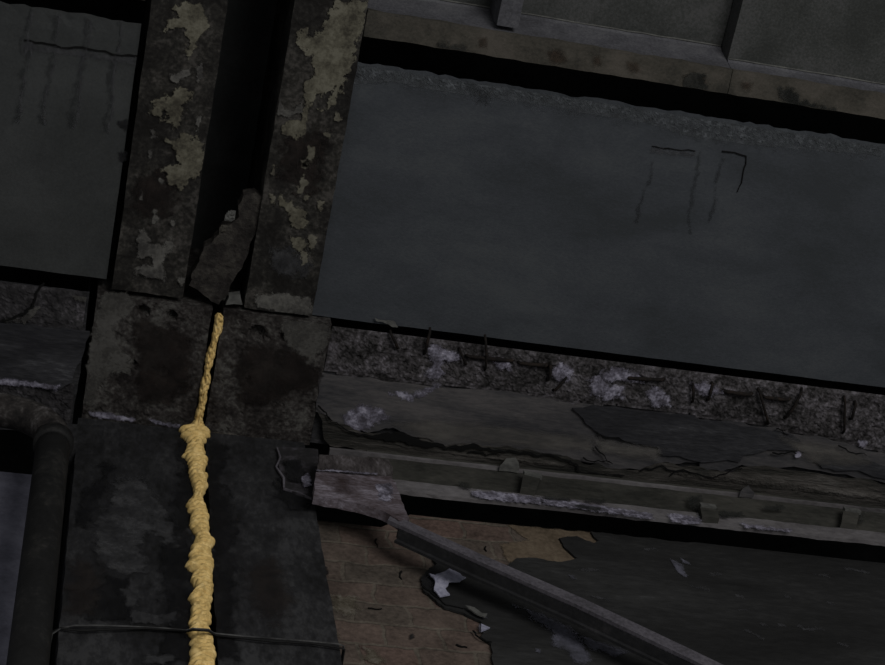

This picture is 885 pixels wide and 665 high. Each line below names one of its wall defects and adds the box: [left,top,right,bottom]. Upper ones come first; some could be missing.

peeling [145,1,210,191]
peeling [135,209,177,282]
damp [84,292,195,407]
damp [232,293,331,411]
crack [318,405,743,479]
spalling [324,318,885,453]
peeling [421,561,657,665]
peeling [508,531,885,665]